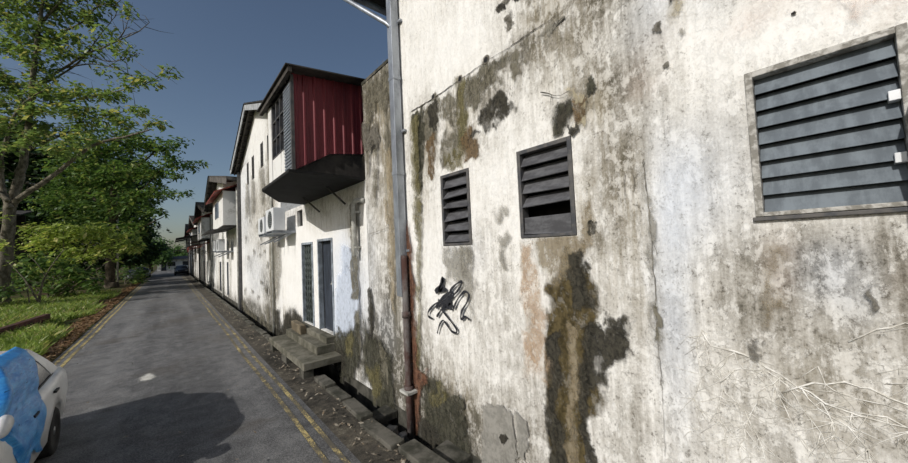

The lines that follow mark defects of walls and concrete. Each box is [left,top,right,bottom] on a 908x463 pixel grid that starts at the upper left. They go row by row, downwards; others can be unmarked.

damp [363,64,391,204]
rust [383,148,395,311]
rust [406,226,428,435]
damp [410,32,529,367]
damp [552,75,596,137]
damp [536,202,632,463]